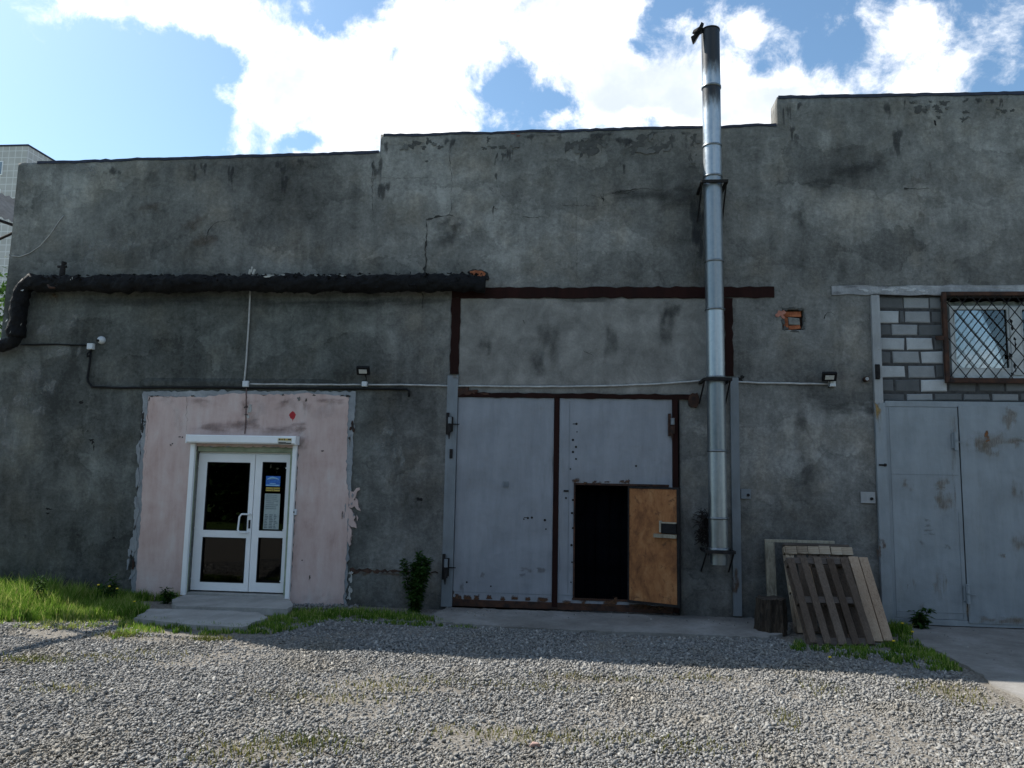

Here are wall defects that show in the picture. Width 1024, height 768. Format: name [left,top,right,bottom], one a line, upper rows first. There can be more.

flaking render [565,136,606,158]
crack [421,155,455,309]
peeling [342,488,361,546]